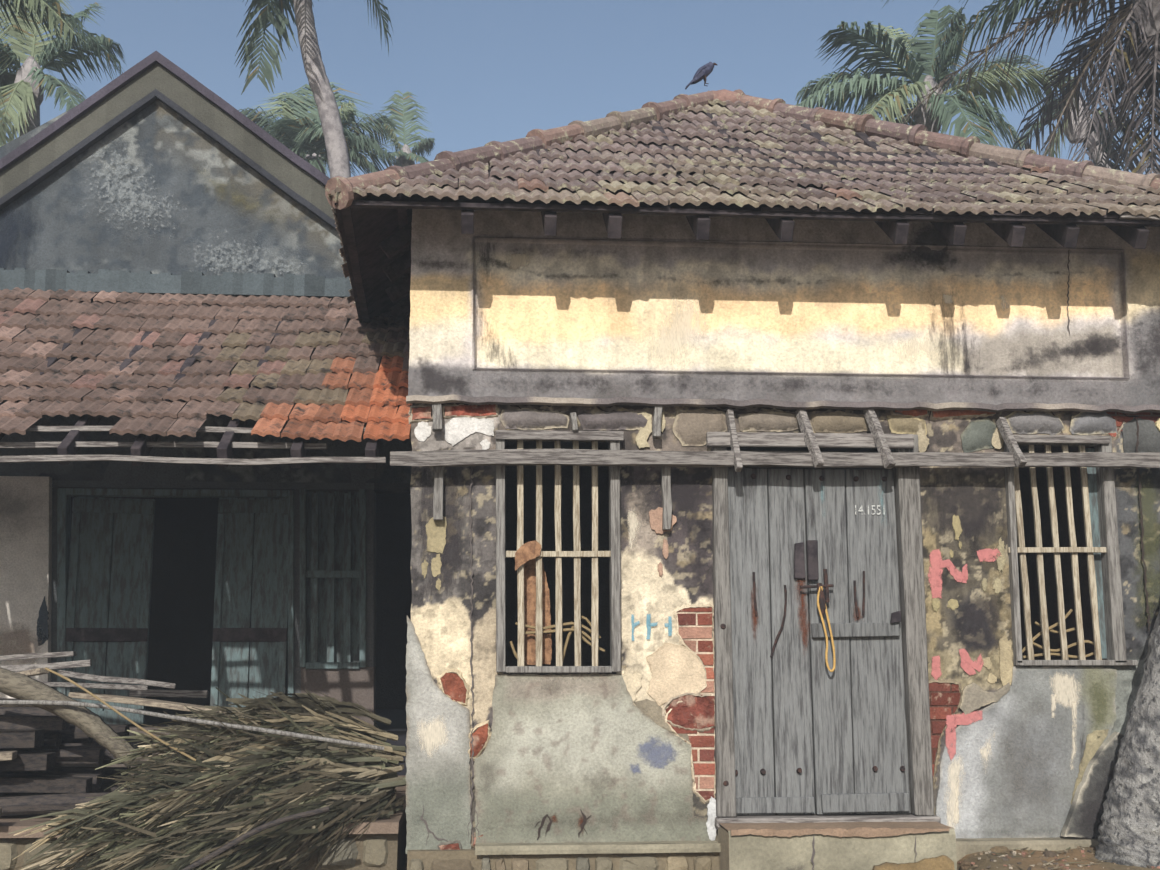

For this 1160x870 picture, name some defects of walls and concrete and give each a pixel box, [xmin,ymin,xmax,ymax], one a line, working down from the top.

leakage [891,225,948,271]
crack [1064,250,1072,333]
leakage [932,323,970,374]
leakage [1026,336,1119,365]
peeling [408,403,499,450]
spalling [635,411,666,449]
spalling [648,507,677,576]
peeling [949,514,962,558]
flaking render [437,668,470,706]
flaking render [468,720,491,761]
flaking render [622,604,950,841]
flaking render [929,631,1013,790]